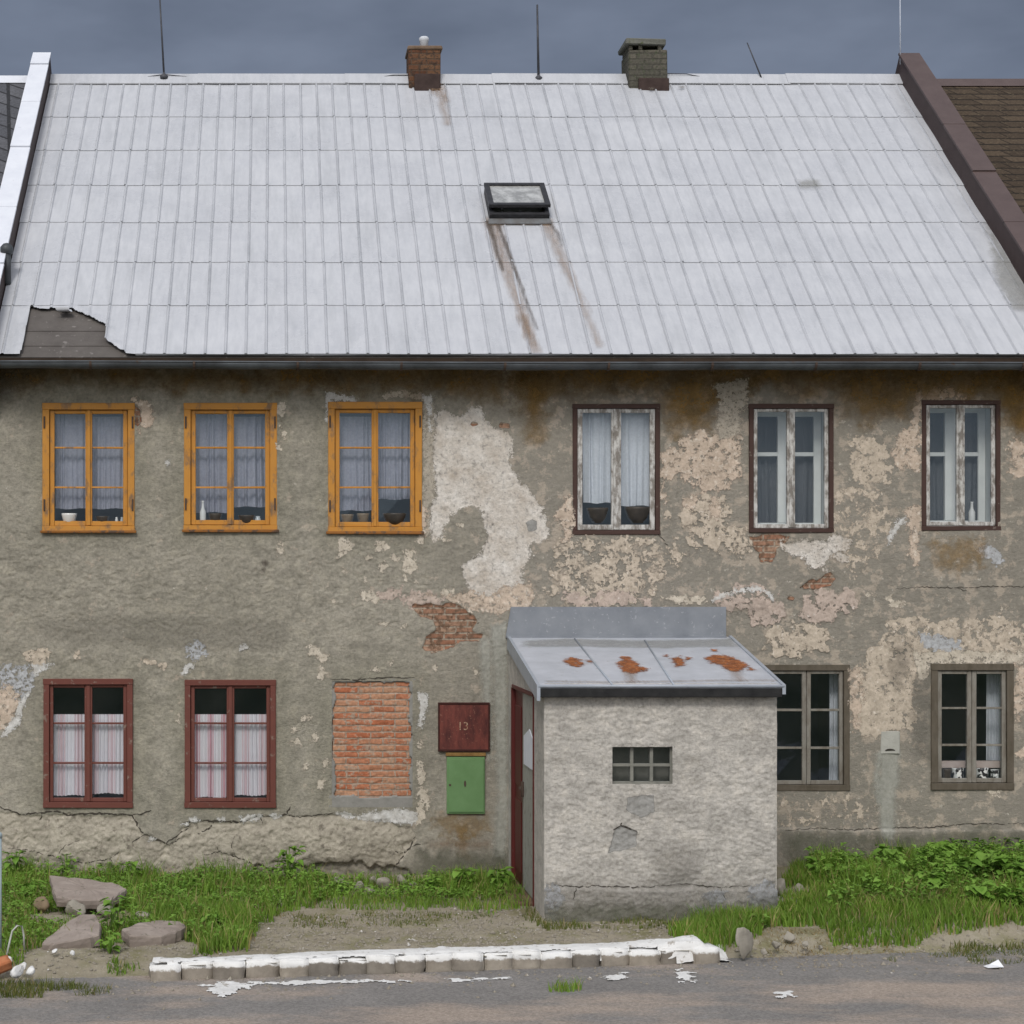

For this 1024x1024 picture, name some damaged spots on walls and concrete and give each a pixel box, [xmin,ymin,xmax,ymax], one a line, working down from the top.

corrosion [486,220,518,278]
flaking render [1005,436,1024,478]
flaking render [360,377,969,674]
flaking render [975,543,1005,568]
flaking render [0,648,55,737]
flaking render [306,644,330,681]
corrosion [564,657,592,667]
corrosion [616,656,648,673]
flaking render [848,591,1024,745]
flaking render [0,692,434,877]
crack [0,806,332,868]
flaking render [608,826,637,853]